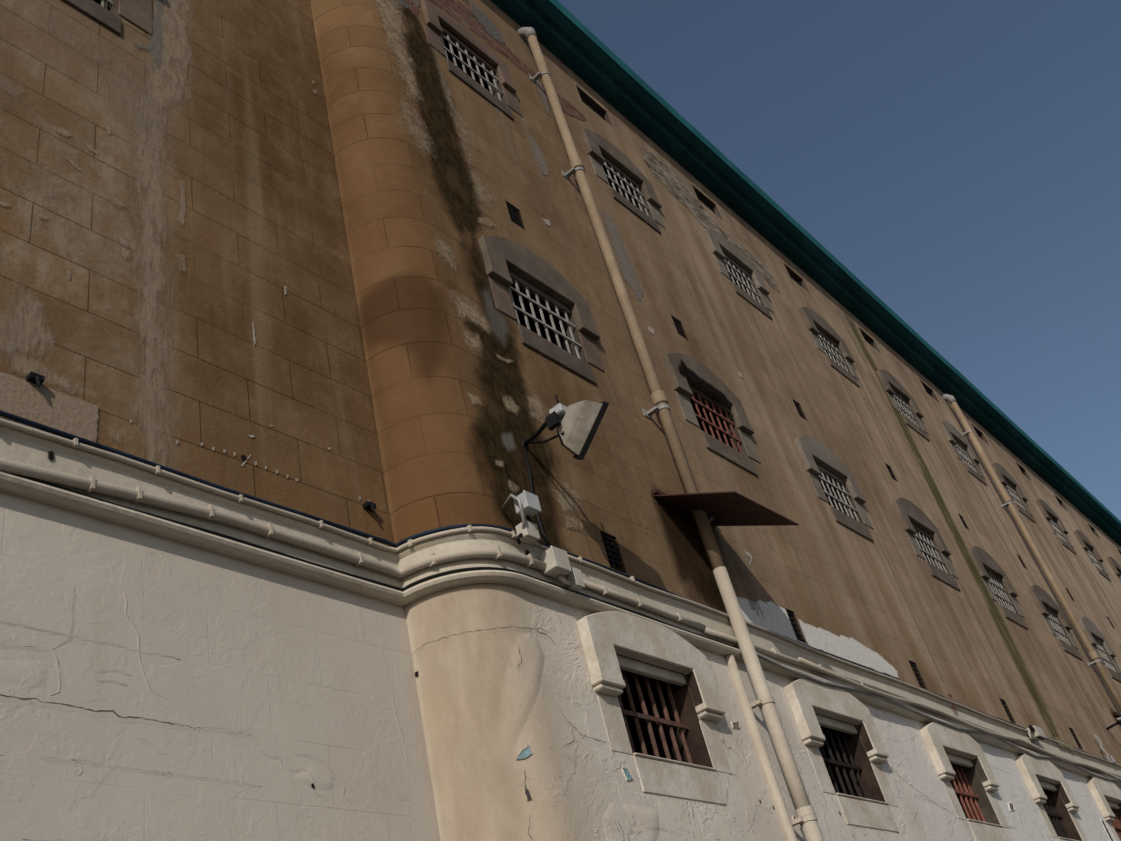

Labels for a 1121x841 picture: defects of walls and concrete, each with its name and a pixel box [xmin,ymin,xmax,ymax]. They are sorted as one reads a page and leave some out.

water stain [132,0,191,466]
water stain [377,0,583,551]
crack [0,586,351,802]
peeling [516,745,532,761]